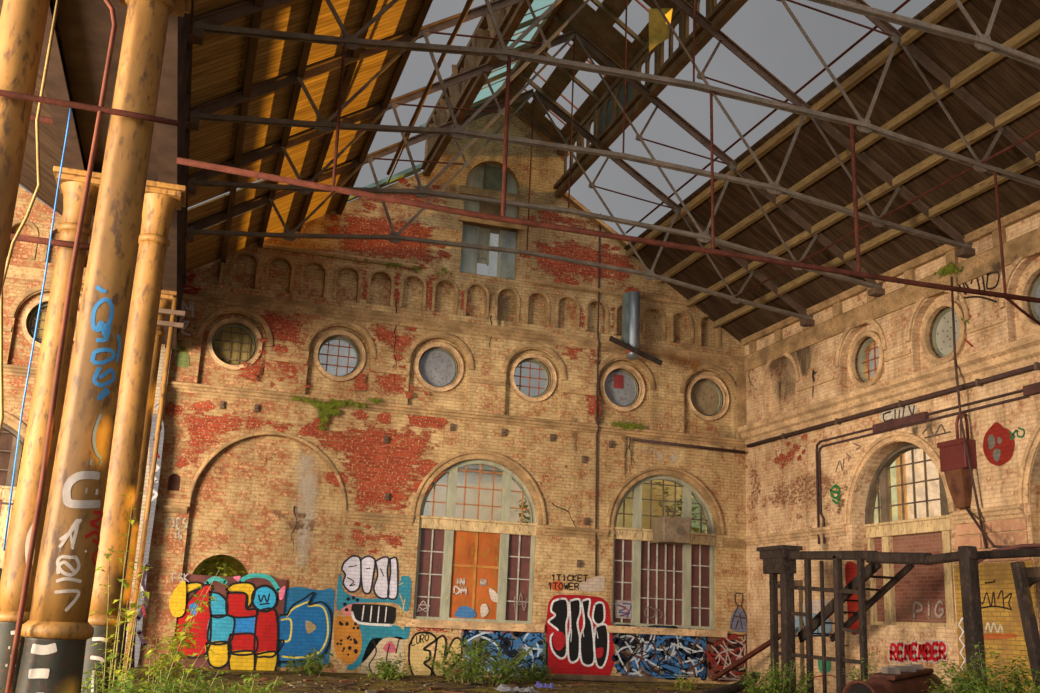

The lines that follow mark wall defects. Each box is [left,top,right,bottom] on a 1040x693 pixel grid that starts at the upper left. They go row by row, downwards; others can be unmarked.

peeling [327,177,451,315]
peeling [520,210,639,292]
peeling [165,400,449,556]